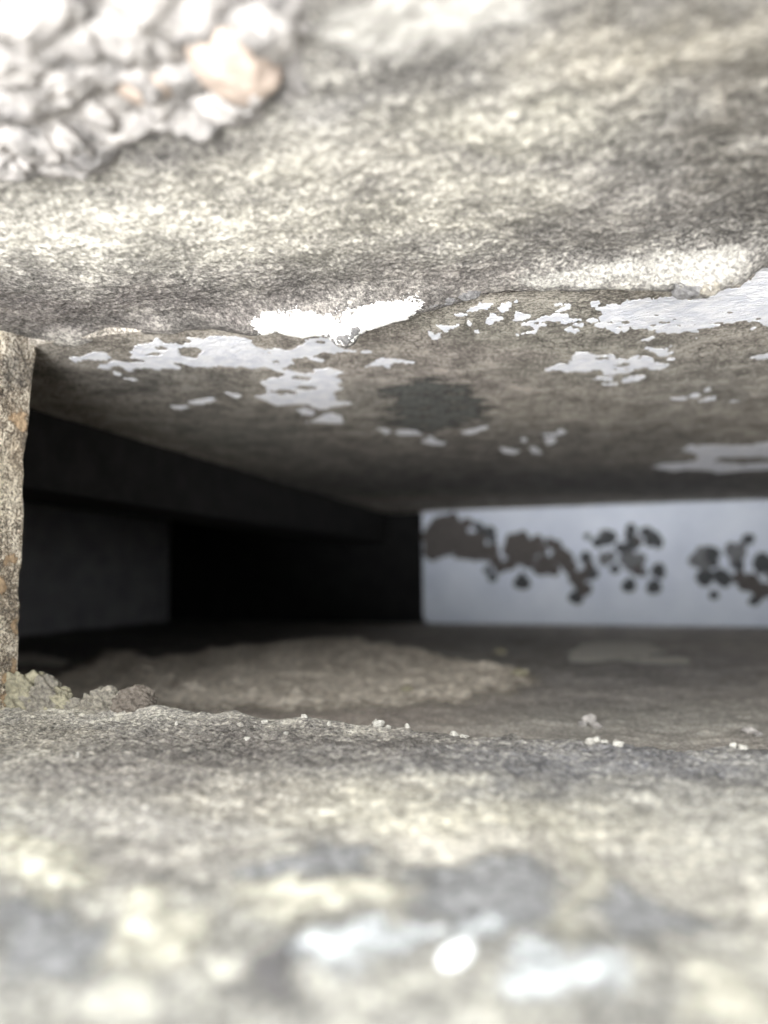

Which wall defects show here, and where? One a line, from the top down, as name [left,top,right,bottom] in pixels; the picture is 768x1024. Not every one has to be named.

peeling [69,291,425,424]
water stain [373,377,496,433]
peeling [427,244,768,386]
peeling [652,442,768,474]